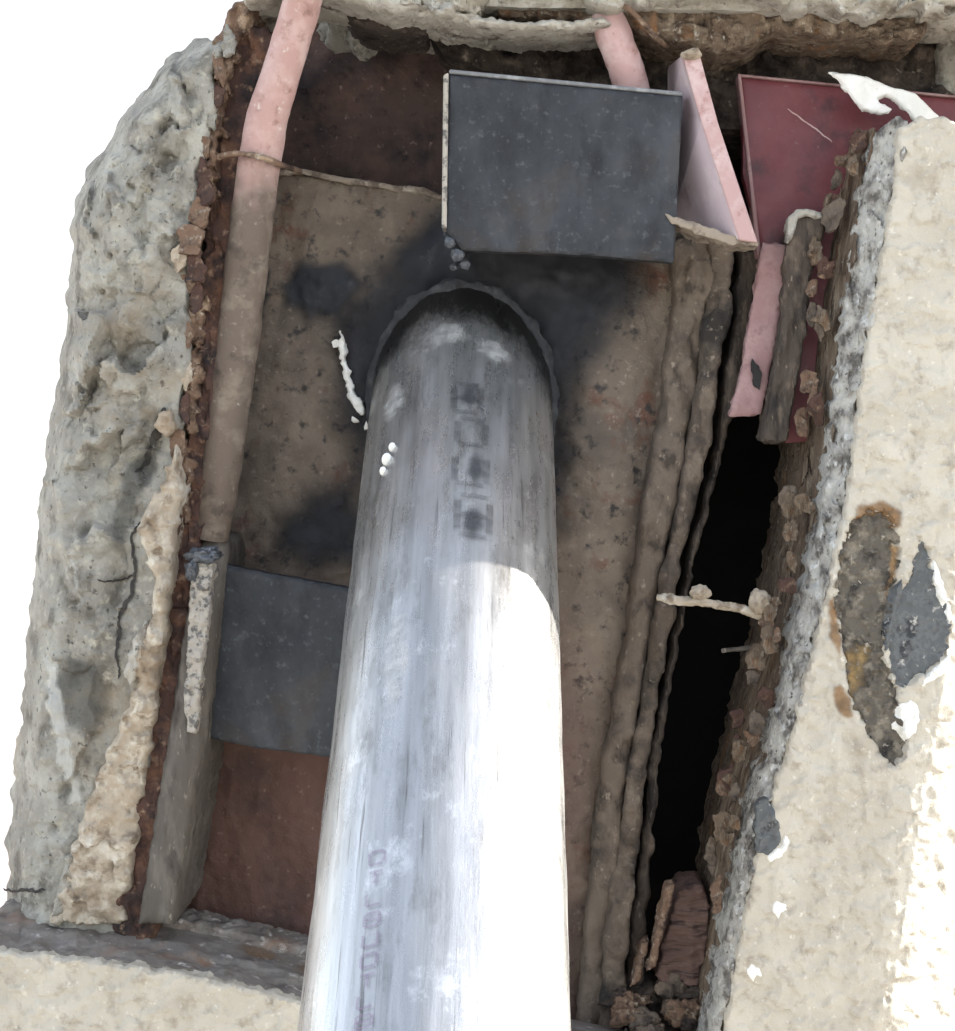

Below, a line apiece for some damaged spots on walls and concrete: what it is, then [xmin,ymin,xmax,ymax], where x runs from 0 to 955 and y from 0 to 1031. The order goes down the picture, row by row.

spalling [731,159,750,218]
peeling [805,152,859,342]
crack [136,407,166,472]
rust [170,283,212,554]
peeling [794,370,824,438]
crack [97,521,141,679]
spalling [645,414,815,947]
spalling [833,509,952,766]
peeling [0,898,22,915]
peeling [163,908,309,960]